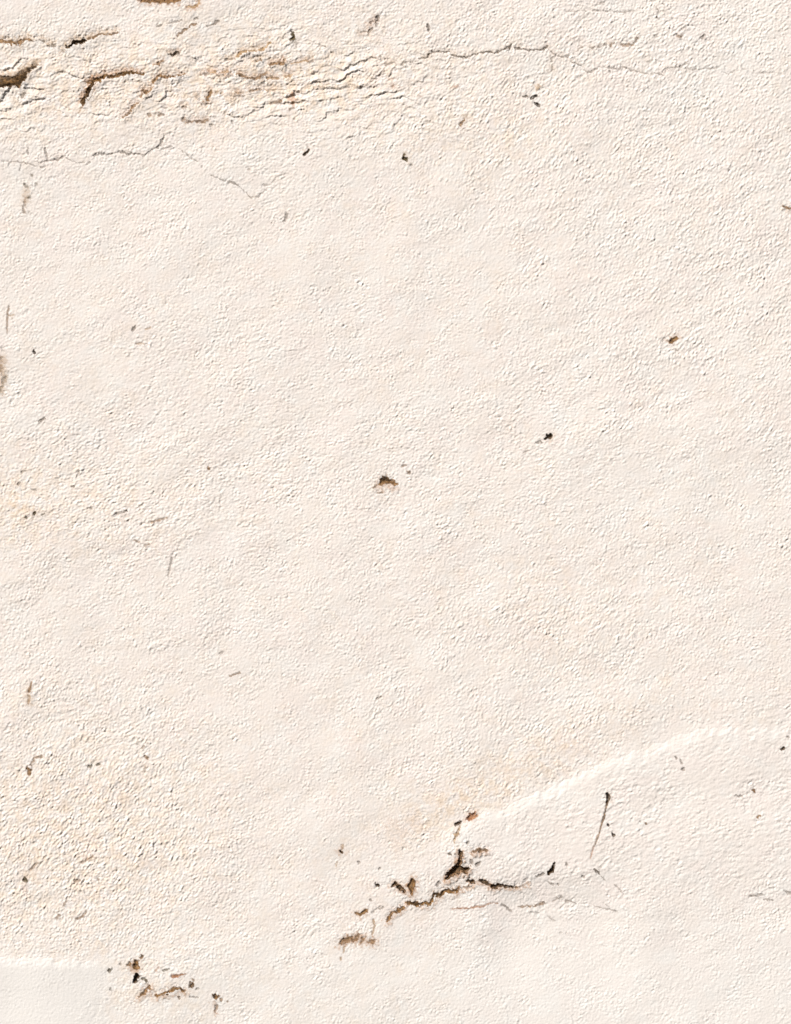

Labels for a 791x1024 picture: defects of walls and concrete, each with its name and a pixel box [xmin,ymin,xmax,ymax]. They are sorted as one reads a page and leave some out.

spalling [0,65,37,98]
crack [0,31,118,52]
spalling [80,51,180,106]
crack [122,73,185,118]
crack [211,42,293,84]
crack [422,45,548,58]
spalling [373,474,398,493]
crack [386,863,555,922]
spalling [126,954,147,983]